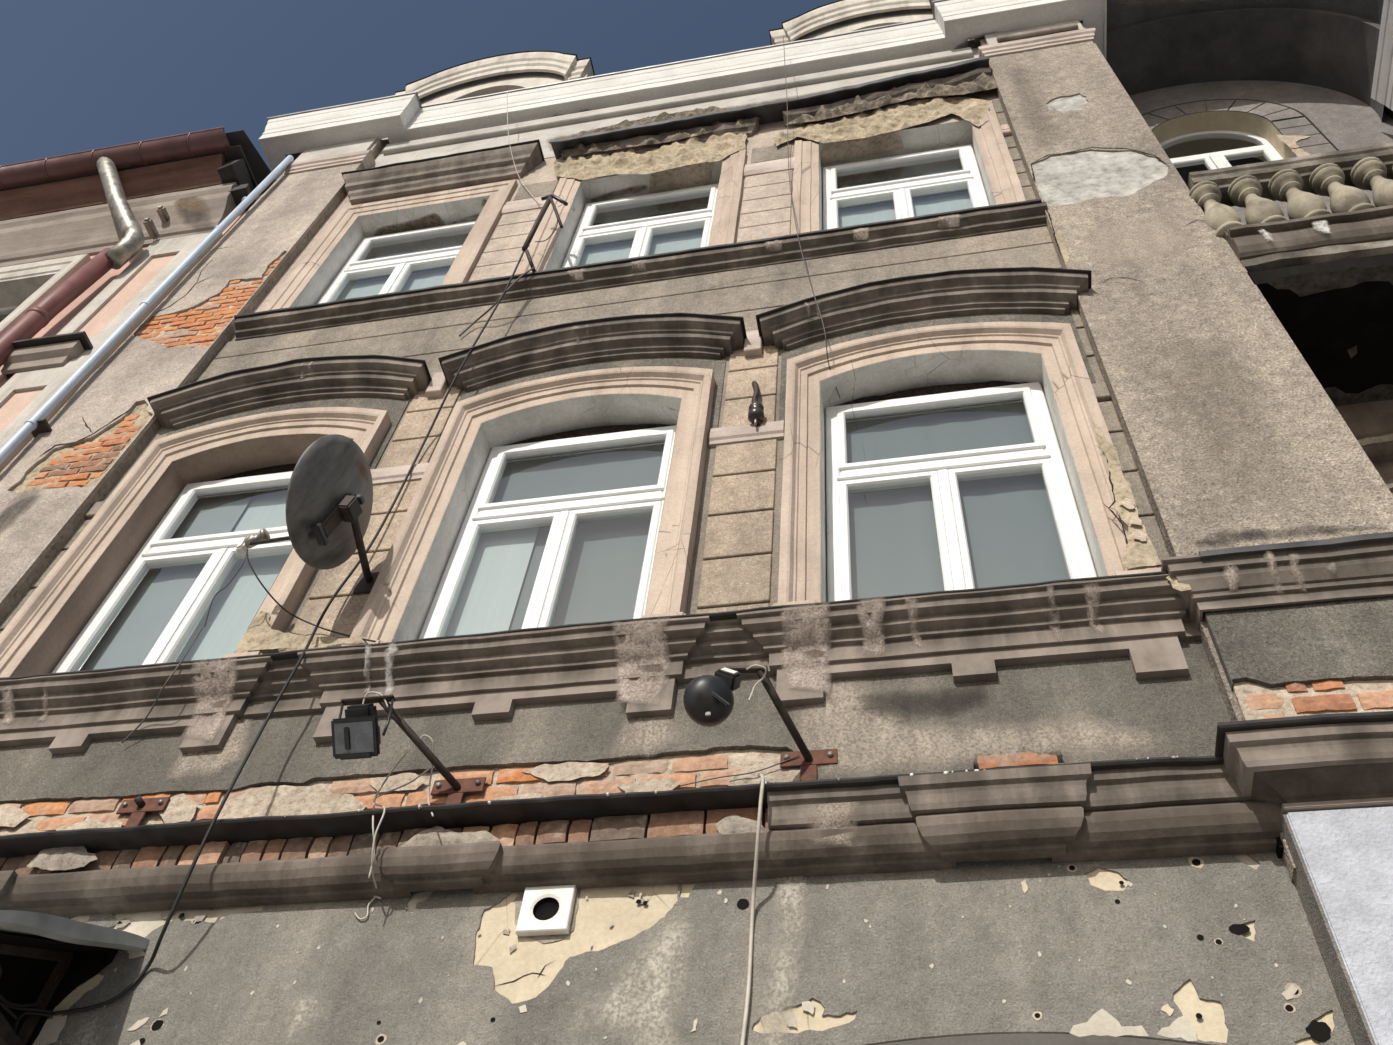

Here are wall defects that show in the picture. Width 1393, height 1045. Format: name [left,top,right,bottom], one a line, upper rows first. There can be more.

flaking render [553,106,763,194]
flaking render [773,72,998,166]
flaking render [135,253,286,348]
peeling [1324,384,1393,407]
flaking render [11,403,152,493]
peeling [1357,434,1393,446]
flaking render [1092,422,1191,591]
flaking render [1233,680,1393,720]
flaking render [0,749,800,836]
peeling [474,883,697,1013]
peeling [752,999,857,1033]
peeling [1069,980,1228,1043]